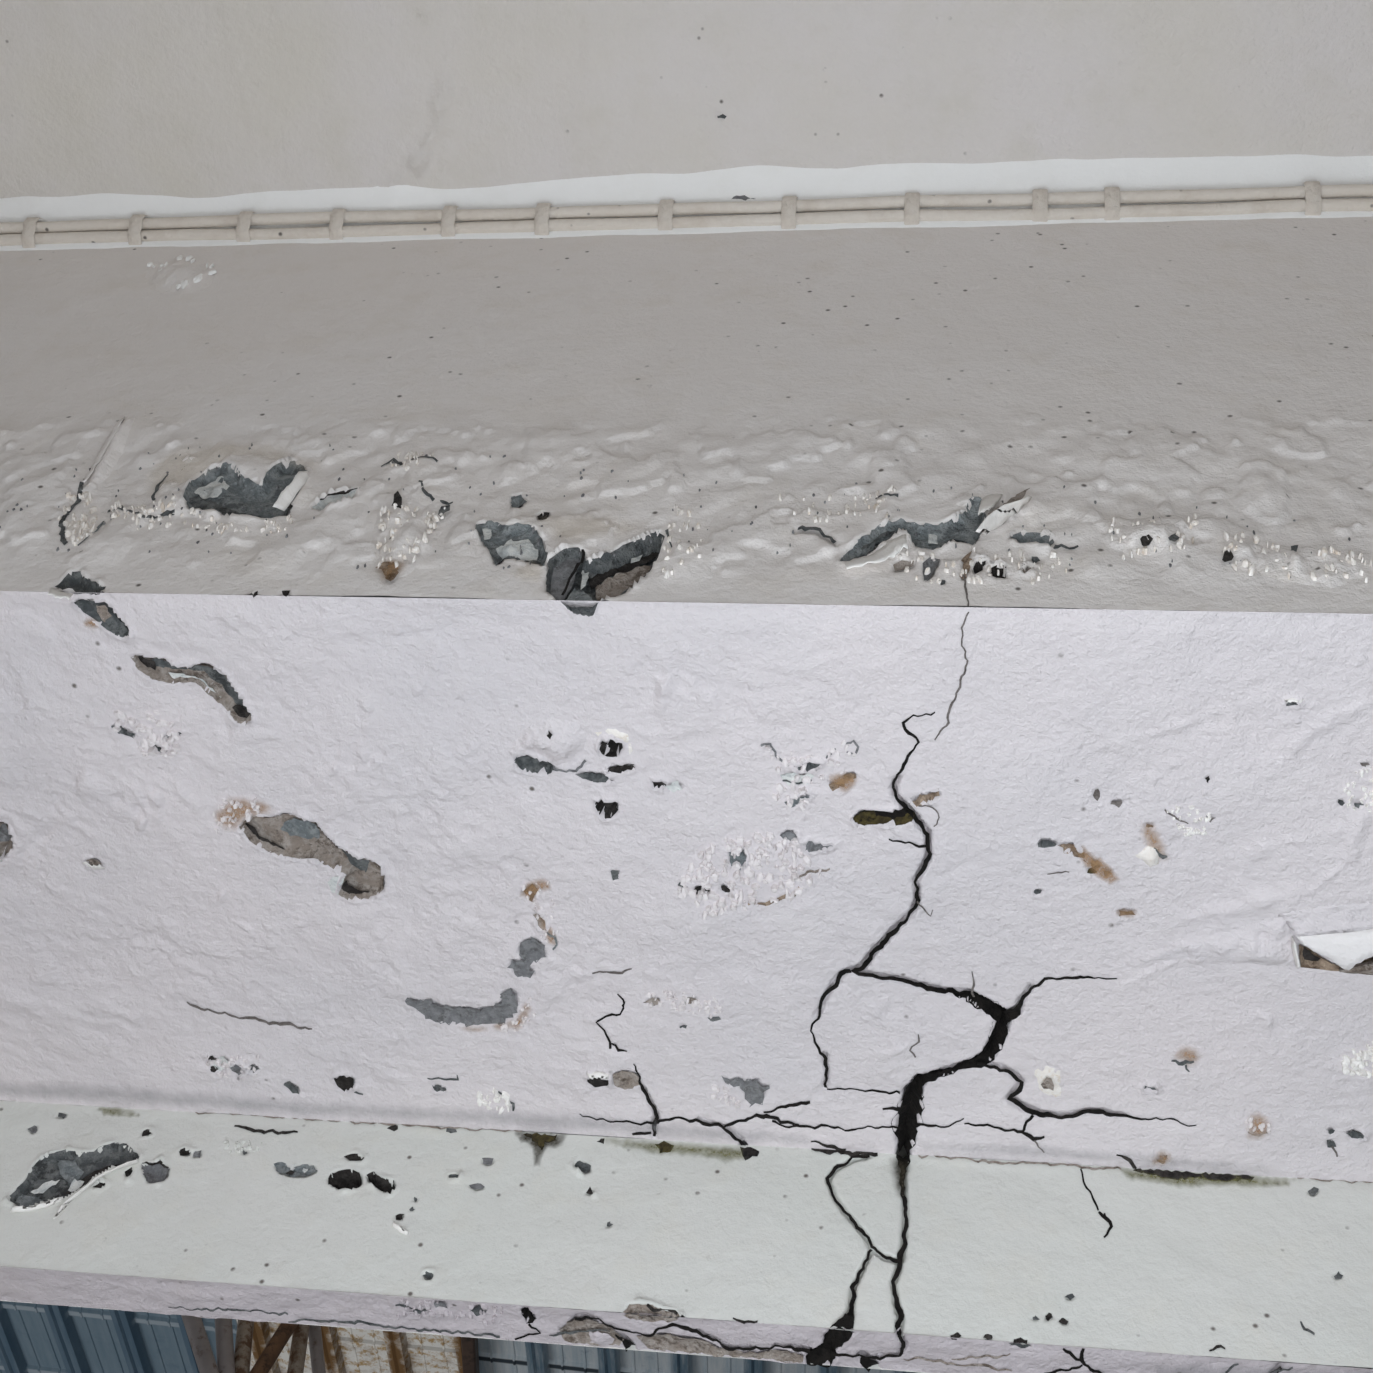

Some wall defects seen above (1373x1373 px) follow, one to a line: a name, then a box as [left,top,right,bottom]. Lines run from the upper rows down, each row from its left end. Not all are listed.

spalling [56,447,312,553]
spalling [468,481,717,617]
spalling [776,483,1078,585]
spalling [48,571,129,637]
spalling [131,655,251,724]
peeling [508,717,635,783]
spalling [212,797,385,900]
peeling [595,800,618,819]
peeling [405,936,546,1033]
crack [168,574,1196,1373]
peeling [1146,903,1373,975]
spalling [10,1129,201,1219]